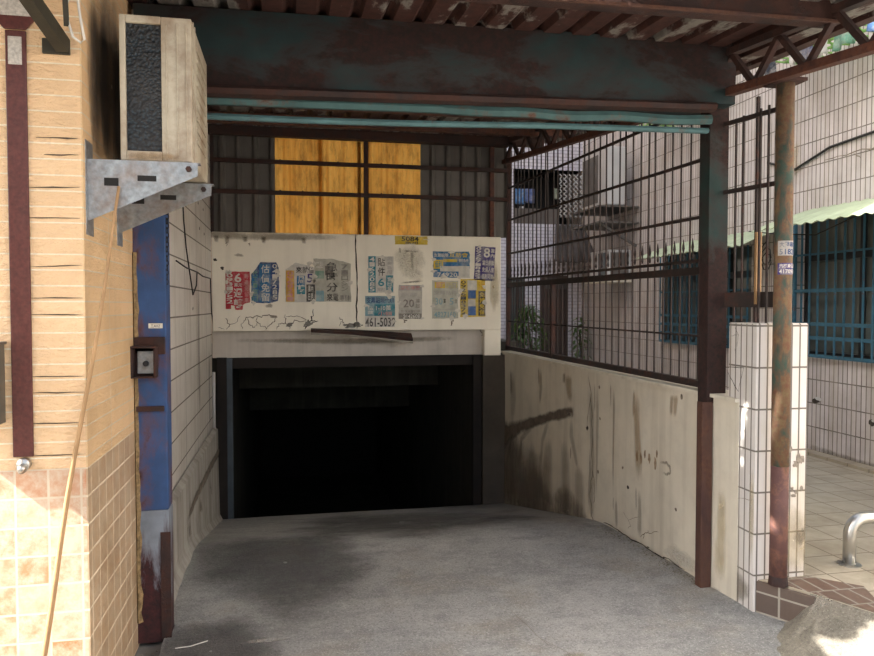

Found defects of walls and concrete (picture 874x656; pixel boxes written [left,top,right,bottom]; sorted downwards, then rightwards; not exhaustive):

crack [36,137,78,156]
crack [29,183,79,191]
crack [339,234,358,326]
crack [31,297,78,315]
crack [219,311,317,330]
crack [34,376,78,393]
water stain [504,408,573,446]